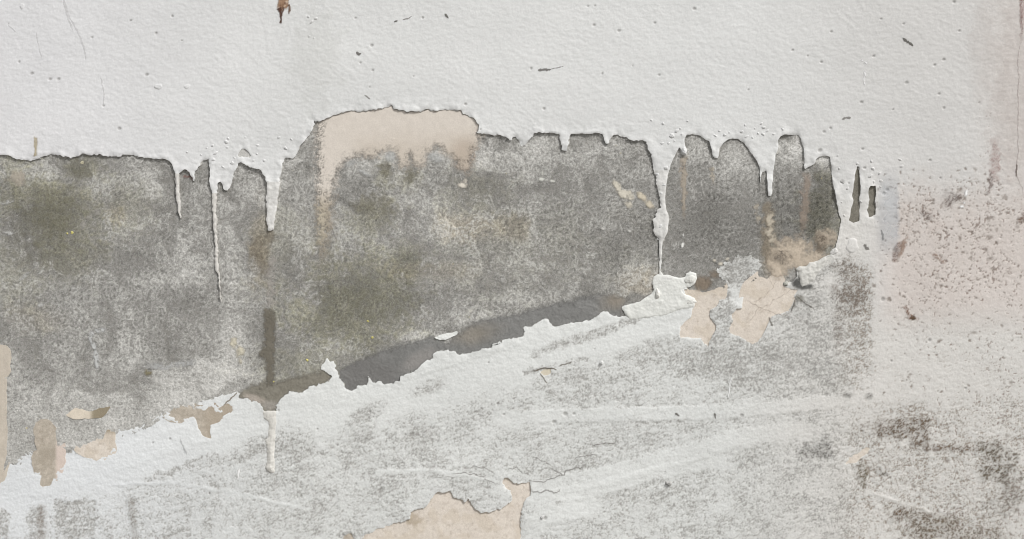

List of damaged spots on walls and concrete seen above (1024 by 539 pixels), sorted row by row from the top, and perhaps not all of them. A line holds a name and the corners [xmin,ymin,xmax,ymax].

water stain [259,260,276,386]
peeling [0,105,876,487]
water stain [695,272,718,290]
water stain [754,205,837,289]
peeling [344,478,531,539]